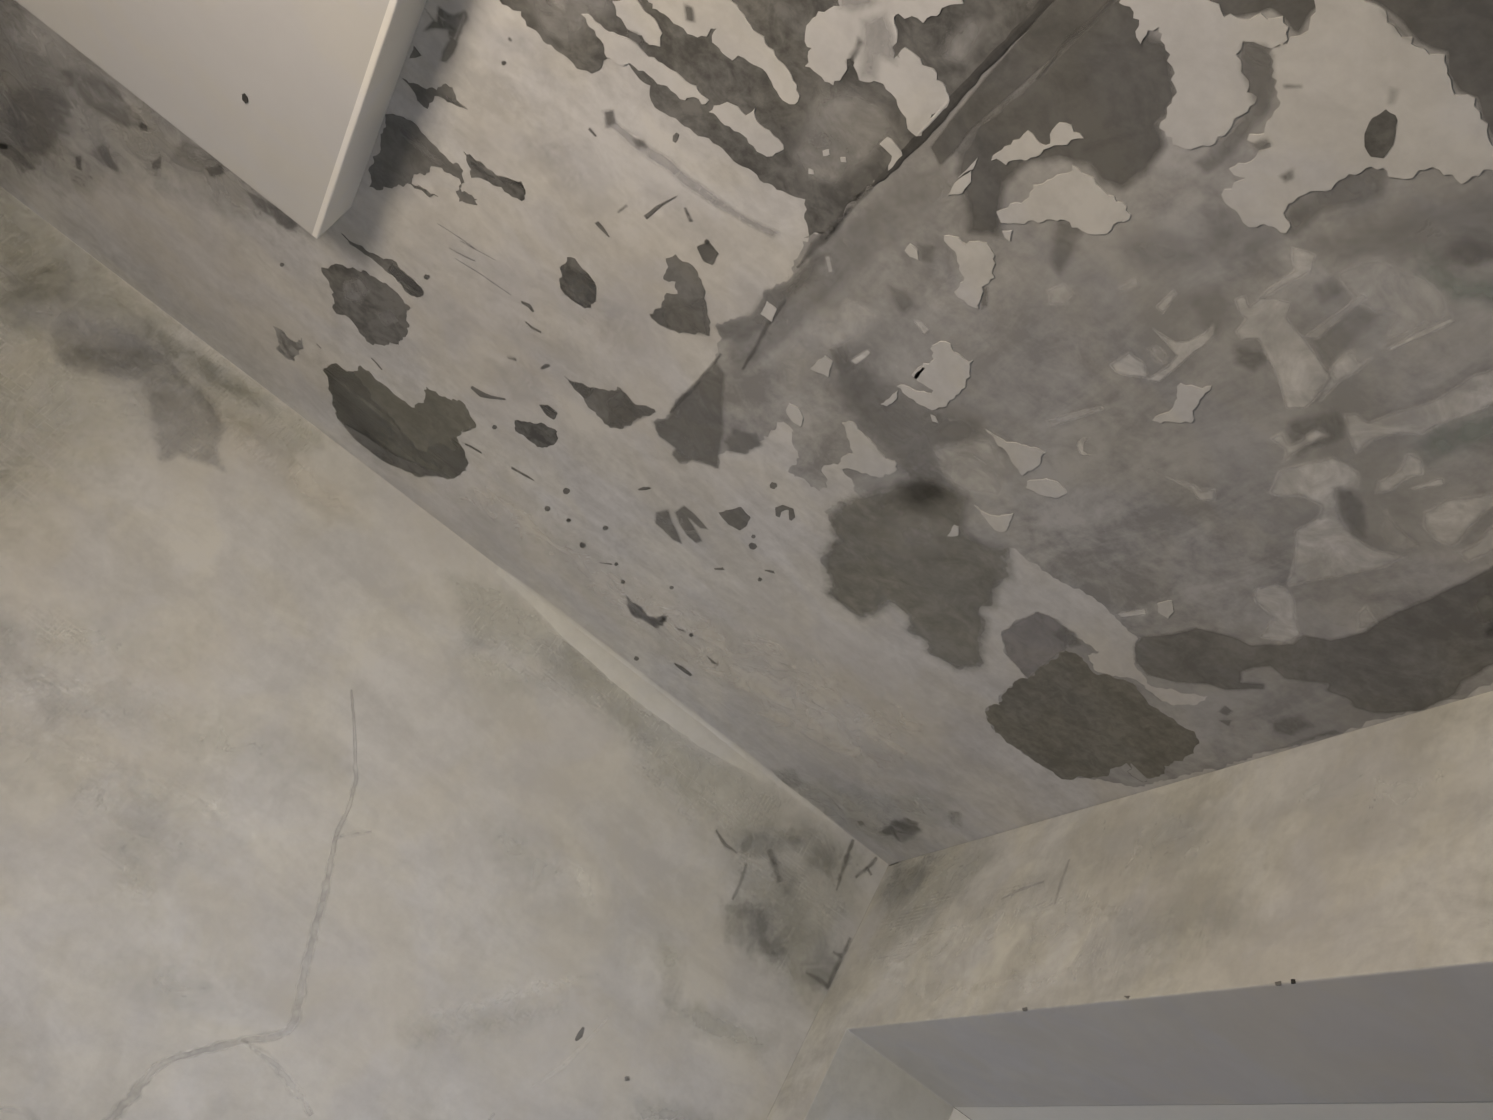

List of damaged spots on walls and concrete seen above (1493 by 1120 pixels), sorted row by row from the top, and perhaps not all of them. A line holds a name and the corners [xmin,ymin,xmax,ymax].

peeling [428,8,466,62]
peeling [402,78,468,110]
peeling [368,114,526,205]
peeling [273,326,321,361]
peeling [321,234,558,480]
peeling [500,0,1493,787]
crack [112,690,357,1118]